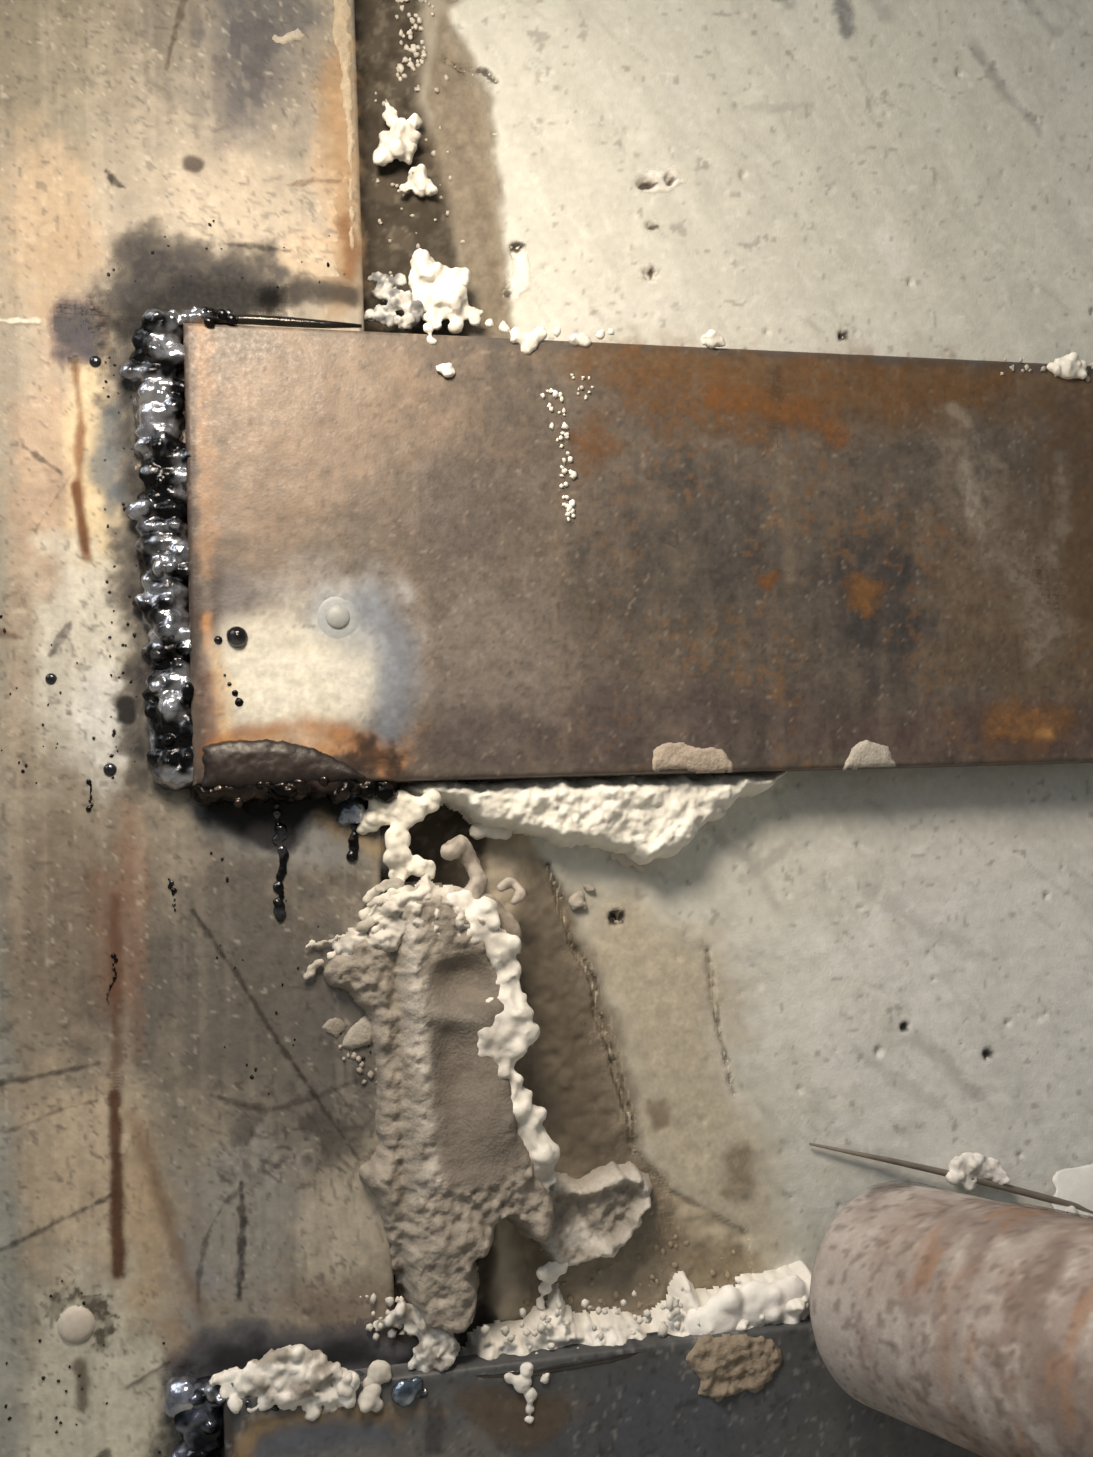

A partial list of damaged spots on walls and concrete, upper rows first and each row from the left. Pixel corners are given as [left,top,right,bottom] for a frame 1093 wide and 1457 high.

rust [73,415,90,559]
rust [989,705,1071,743]
rust [110,1090,123,1276]